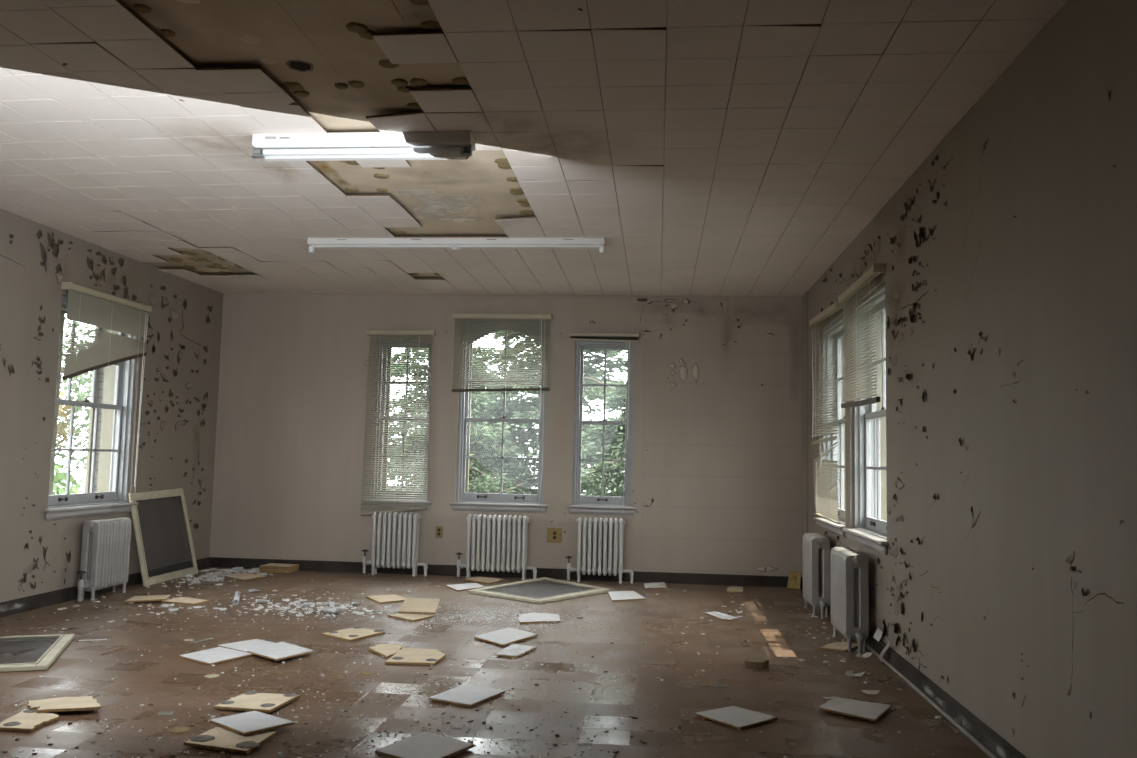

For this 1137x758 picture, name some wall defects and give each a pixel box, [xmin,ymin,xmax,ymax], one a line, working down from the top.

flaking render [285,60,314,72]
peeling [36,230,73,284]
peeling [32,356,50,383]
peeling [87,249,208,457]
peeling [954,331,989,361]
peeling [856,536,939,671]
crack [1066,551,1124,696]